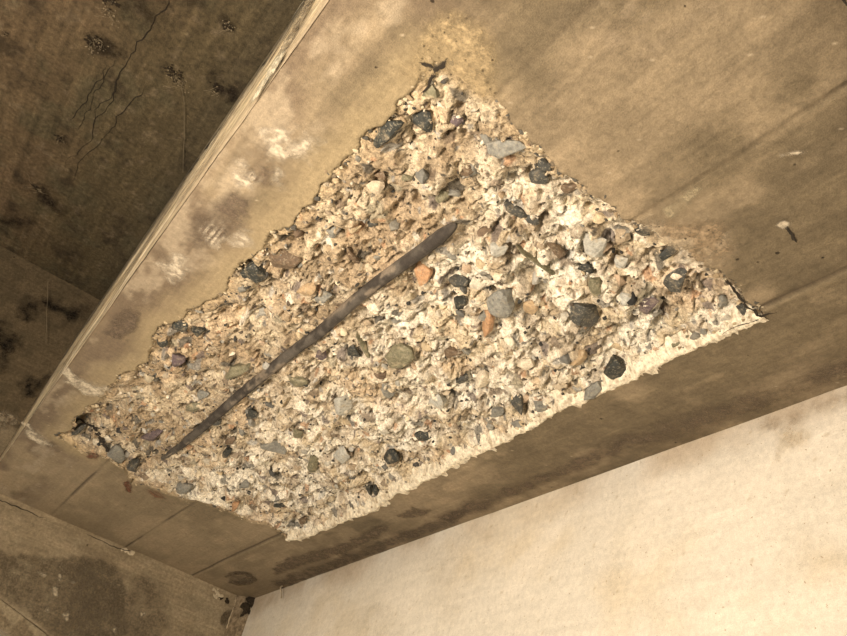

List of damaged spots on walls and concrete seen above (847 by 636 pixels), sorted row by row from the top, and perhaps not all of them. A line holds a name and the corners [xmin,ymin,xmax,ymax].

crack [16,0,305,440]
spalling [53,0,769,542]
crack [785,227,797,243]
water stain [273,502,491,586]
water stain [0,556,164,636]